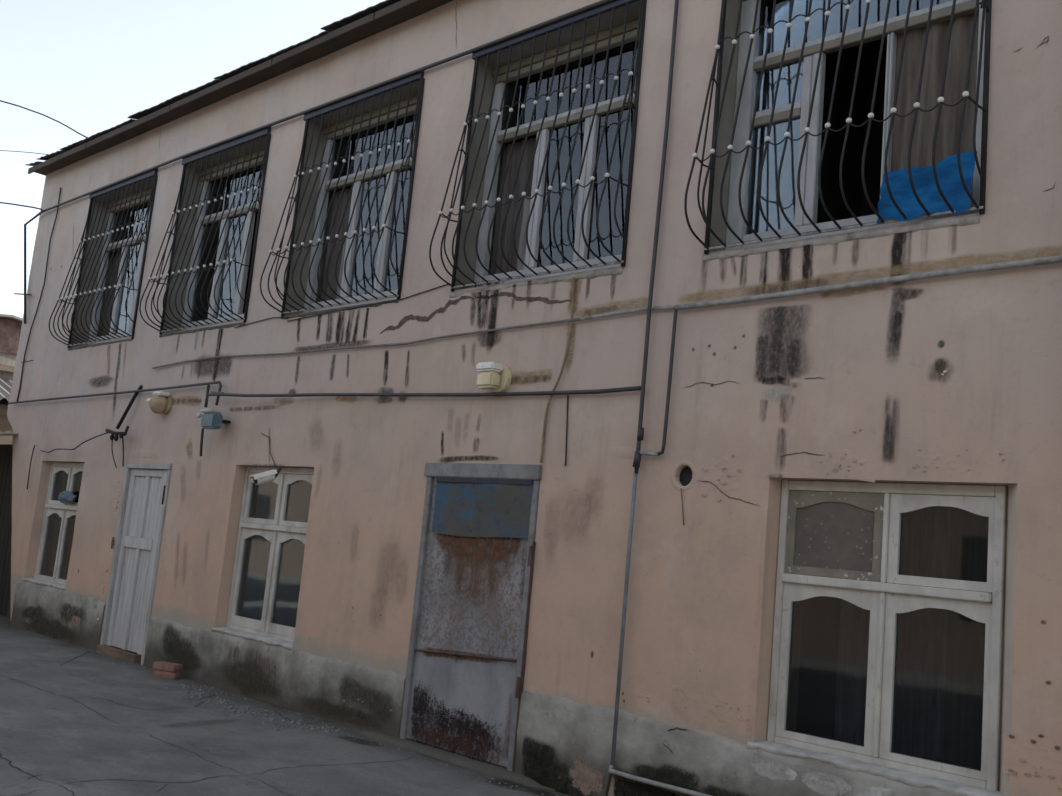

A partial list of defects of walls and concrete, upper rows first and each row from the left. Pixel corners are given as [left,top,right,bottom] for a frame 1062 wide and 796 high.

leakage [761,245,819,294]
leakage [889,232,921,356]
leakage [756,307,802,413]
leakage [884,402,896,458]
corrosion [438,534,519,583]
mould [23,605,84,638]
leakage [163,627,198,669]
corrosion [424,648,491,662]
corrosion [409,682,509,764]
crack [0,734,458,796]
spalling [559,756,604,796]
peeling [1003,734,1062,791]